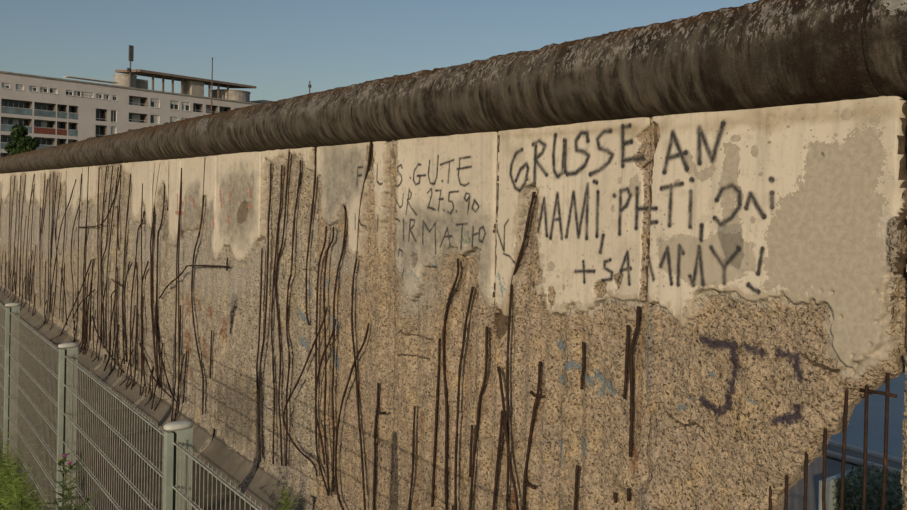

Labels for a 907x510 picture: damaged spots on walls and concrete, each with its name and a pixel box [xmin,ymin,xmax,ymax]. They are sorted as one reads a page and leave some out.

water stain [423,88,442,136]
crack [896,99,907,230]
spalling [0,115,907,510]
crack [893,252,907,278]